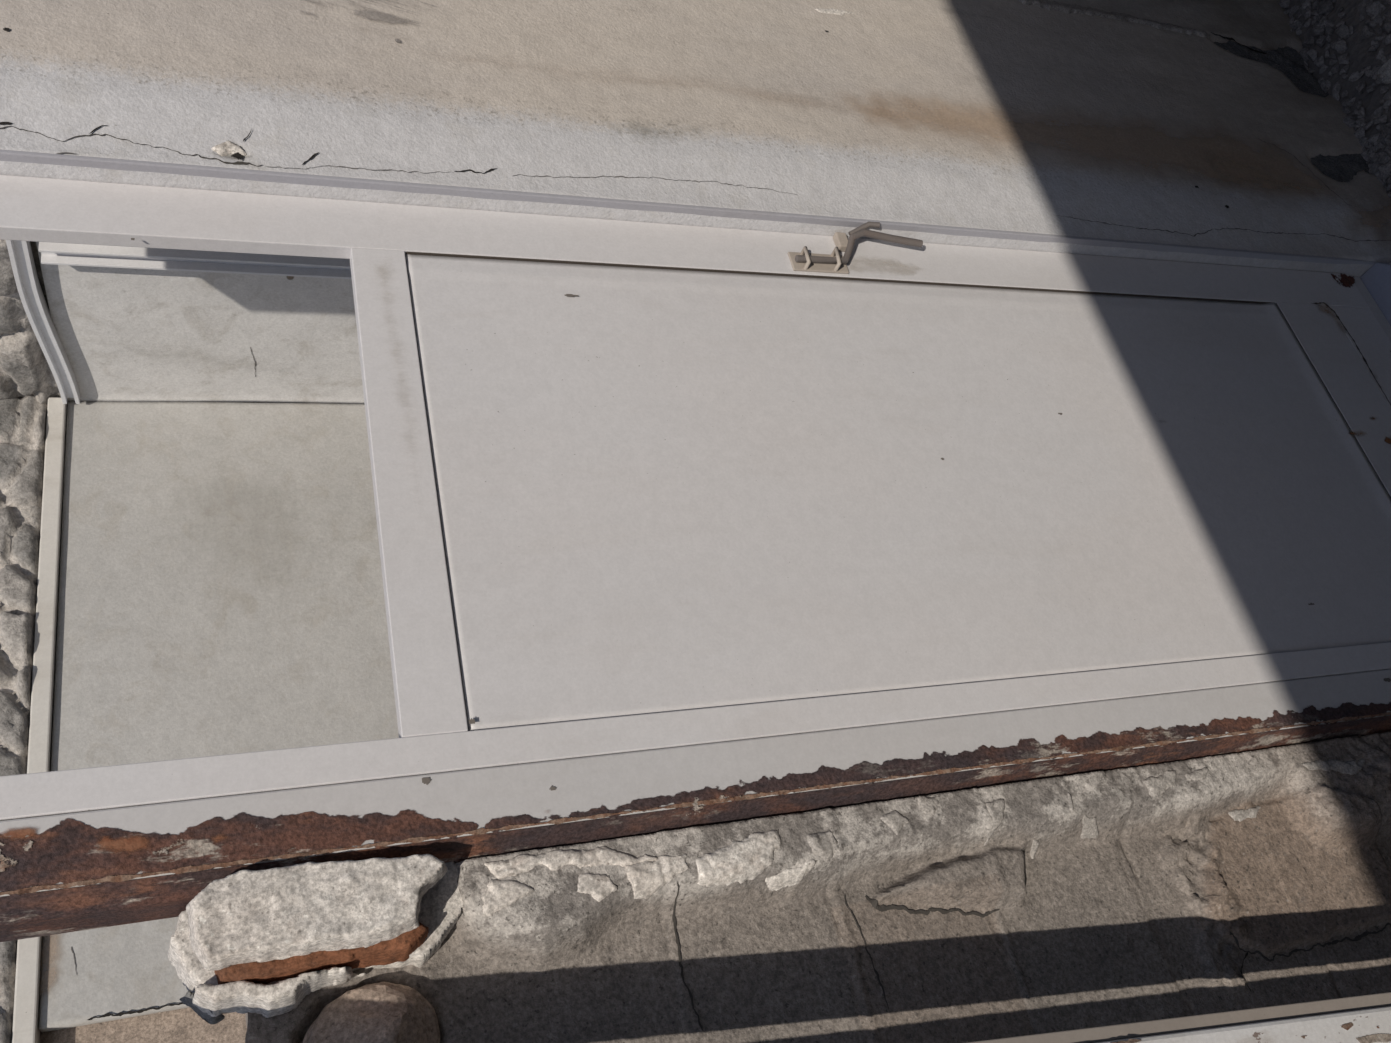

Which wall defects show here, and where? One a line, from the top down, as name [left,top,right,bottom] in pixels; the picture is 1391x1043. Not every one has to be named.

spalling [1211,32,1328,97]
crack [0,122,791,194]
spalling [1311,154,1369,182]
crack [1057,215,1391,242]
rust [1331,274,1355,288]
rust [0,702,1391,942]